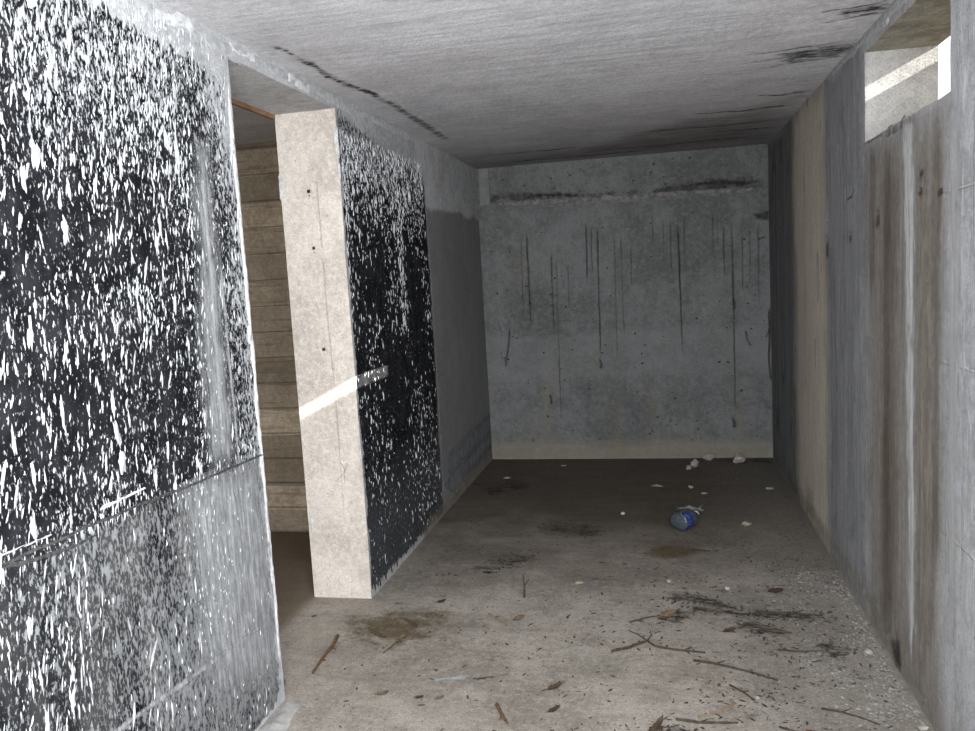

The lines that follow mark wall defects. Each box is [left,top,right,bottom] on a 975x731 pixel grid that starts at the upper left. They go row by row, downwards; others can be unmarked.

damp [756,44,963,718]